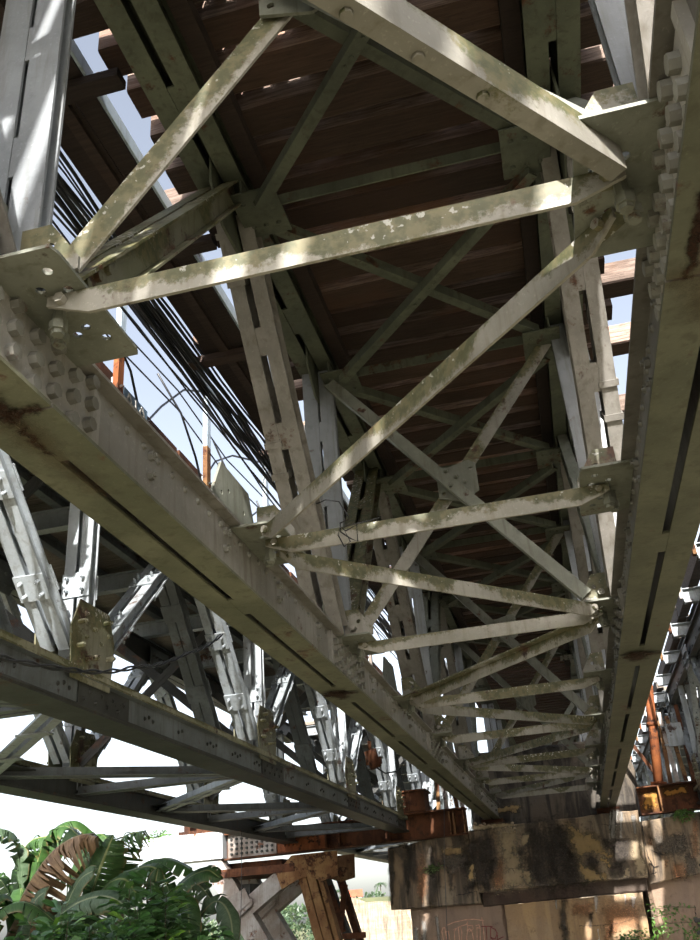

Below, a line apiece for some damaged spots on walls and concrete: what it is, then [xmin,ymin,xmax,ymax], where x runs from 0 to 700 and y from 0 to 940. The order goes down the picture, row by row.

corrosion [682,193,700,280]
corrosion [0,398,53,456]
damp [388,833,498,940]
damp [516,824,599,940]
damp [602,810,636,874]